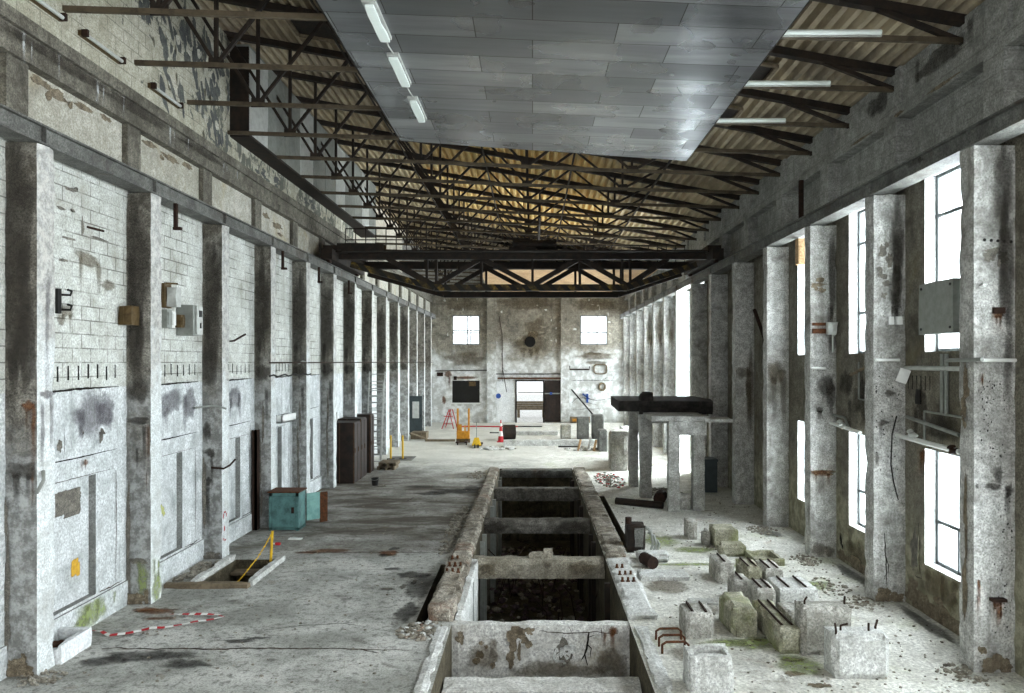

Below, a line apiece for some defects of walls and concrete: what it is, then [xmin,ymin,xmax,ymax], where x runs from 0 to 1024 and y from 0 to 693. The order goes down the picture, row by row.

damp [76,394,113,430]
damp [161,390,195,412]
crack [545,628,618,665]